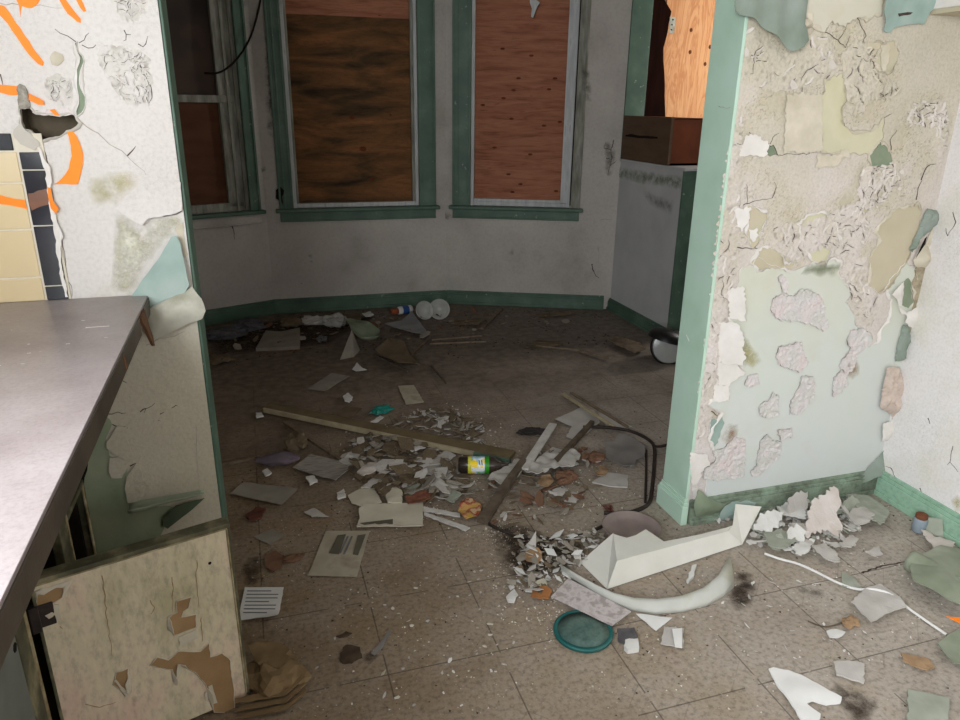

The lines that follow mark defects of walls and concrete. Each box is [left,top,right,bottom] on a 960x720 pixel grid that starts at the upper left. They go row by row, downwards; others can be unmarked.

peeling [13,122,68,297]
crack [82,122,146,174]
peeling [690,0,950,524]
peeling [84,412,205,554]
crack [861,561,905,574]